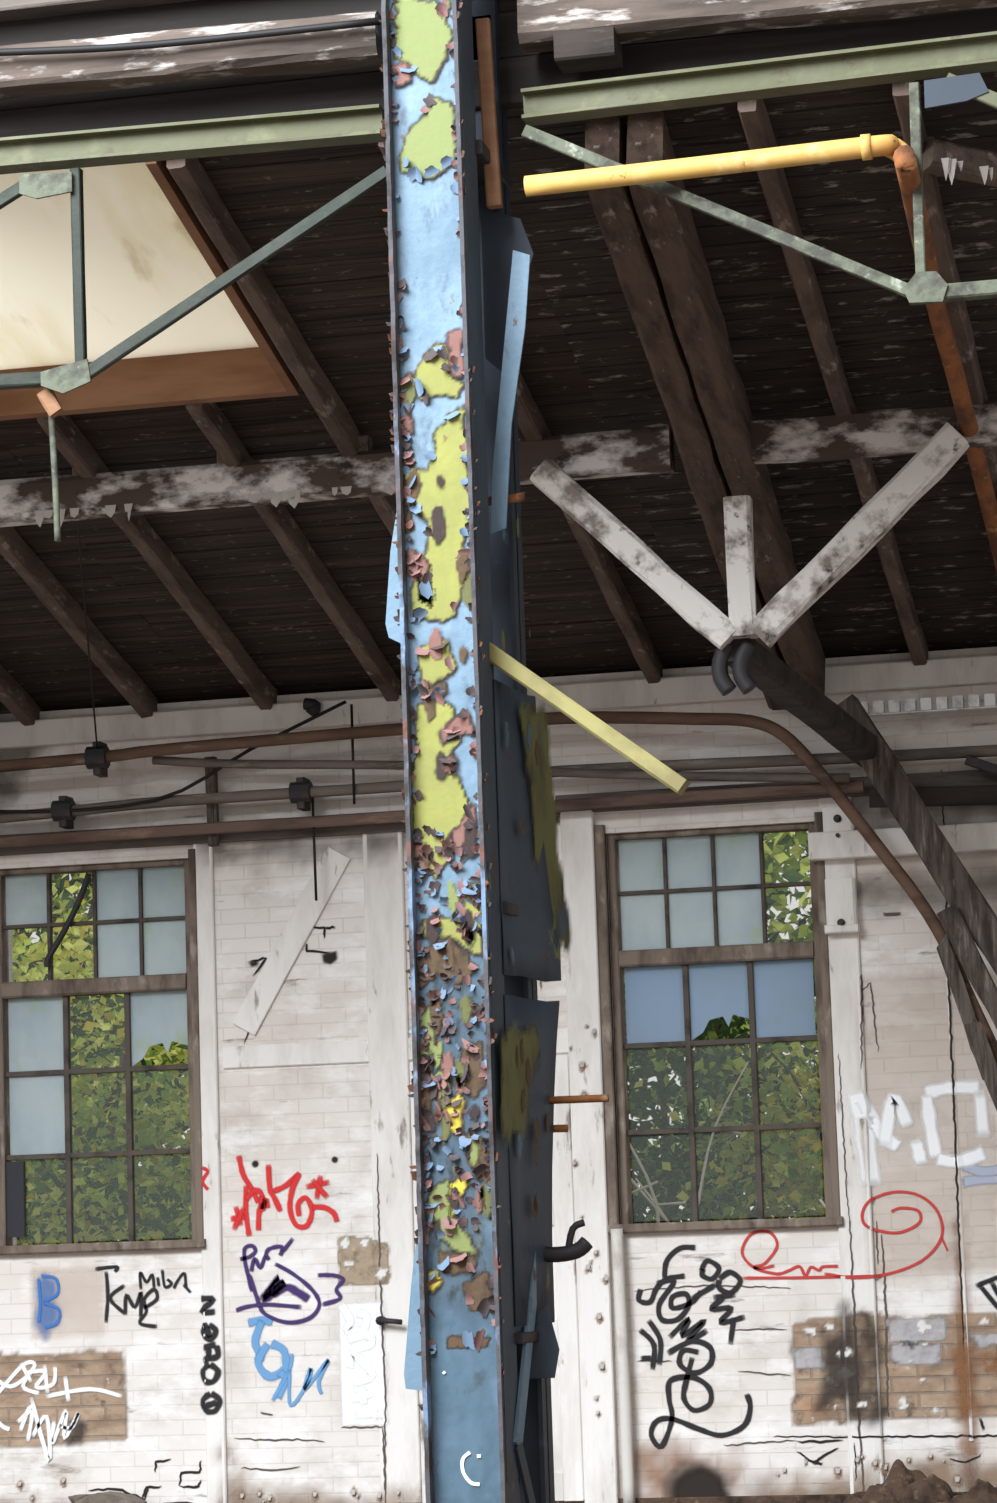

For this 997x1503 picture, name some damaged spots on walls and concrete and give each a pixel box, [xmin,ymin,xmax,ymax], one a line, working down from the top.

peeling [379,0,466,247]
corrosion [893,145,940,275]
peeling [247,490,301,508]
peeling [332,486,352,496]
corrosion [926,303,997,573]
peeling [383,272,550,1356]
peeling [505,704,571,951]
spalling [0,1350,127,1447]
spalling [791,1312,997,1425]